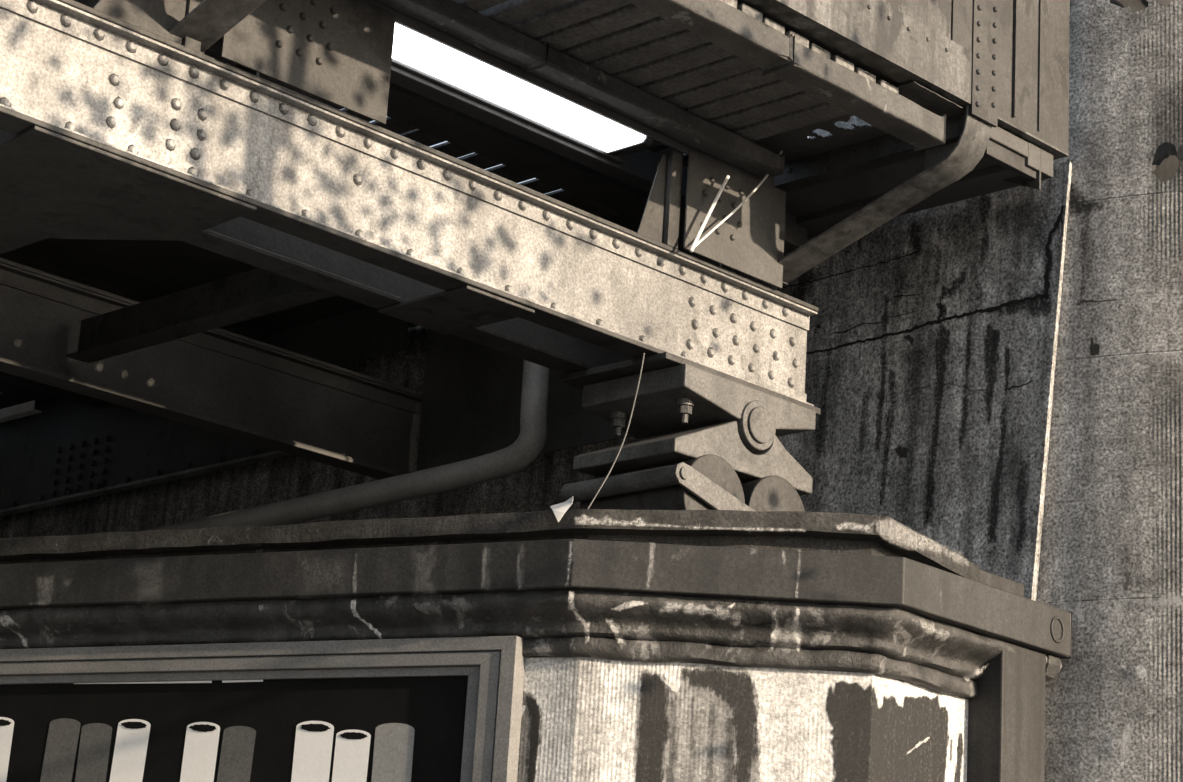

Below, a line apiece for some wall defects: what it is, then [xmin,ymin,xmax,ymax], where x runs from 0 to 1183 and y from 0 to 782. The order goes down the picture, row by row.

water stain [790,272,817,301]
crack [782,251,916,288]
crack [806,183,1116,354]
water stain [815,314,834,455]
water stain [860,295,895,505]
water stain [924,195,1010,543]
water stain [1016,462,1029,552]
peeling [636,668,761,782]
peeling [826,681,963,782]